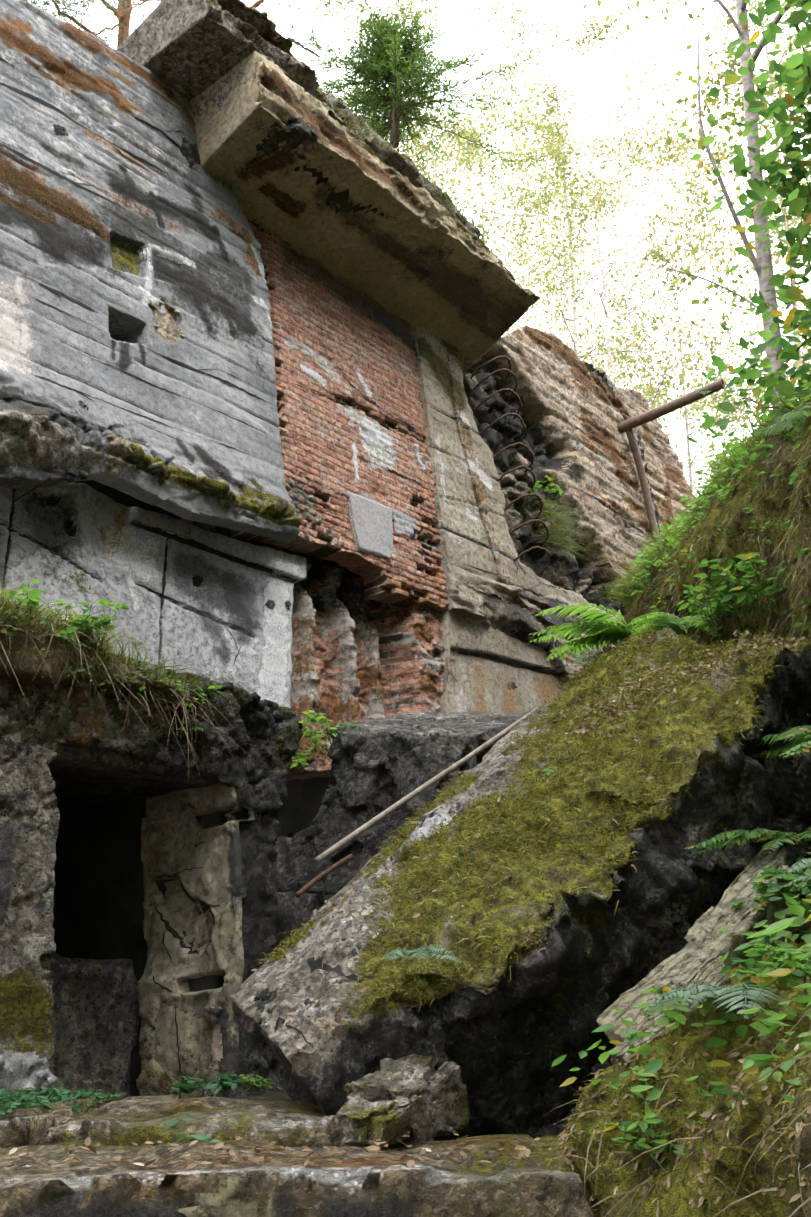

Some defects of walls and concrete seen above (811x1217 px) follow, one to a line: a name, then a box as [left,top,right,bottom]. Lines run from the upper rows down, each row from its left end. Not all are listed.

rust [0,28,120,100]
rust [58,21,102,51]
rust [130,63,174,99]
rust [517,326,629,420]
spalling [285,481,323,525]
peeling [392,506,417,536]
rust [577,412,630,487]
rust [642,427,693,523]
peeling [272,561,299,577]
crack [153,867,219,1099]